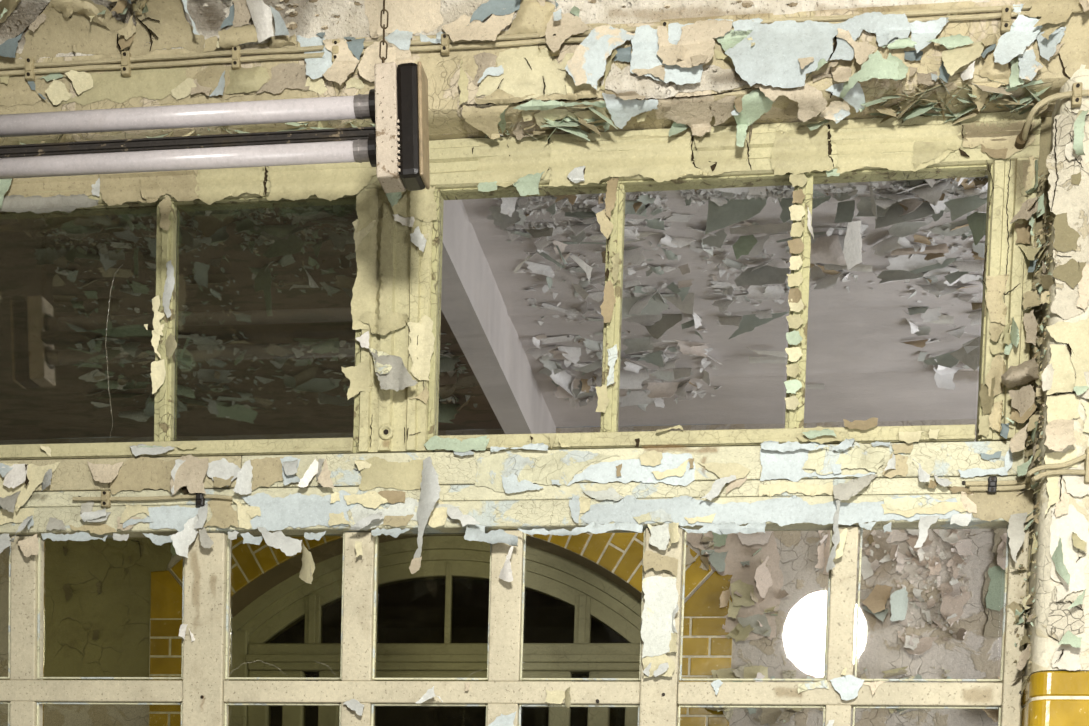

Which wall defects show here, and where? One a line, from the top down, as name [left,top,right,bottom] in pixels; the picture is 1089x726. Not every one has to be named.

crack [829,36,837,58]
crack [1059,54,1071,79]
crack [690,135,700,169]
crack [826,125,834,166]
crack [1051,105,1089,211]
crack [261,166,269,195]
peeling [0,442,518,680]
peeling [1045,475,1089,671]
peeling [343,699,364,716]
peeling [416,686,443,703]